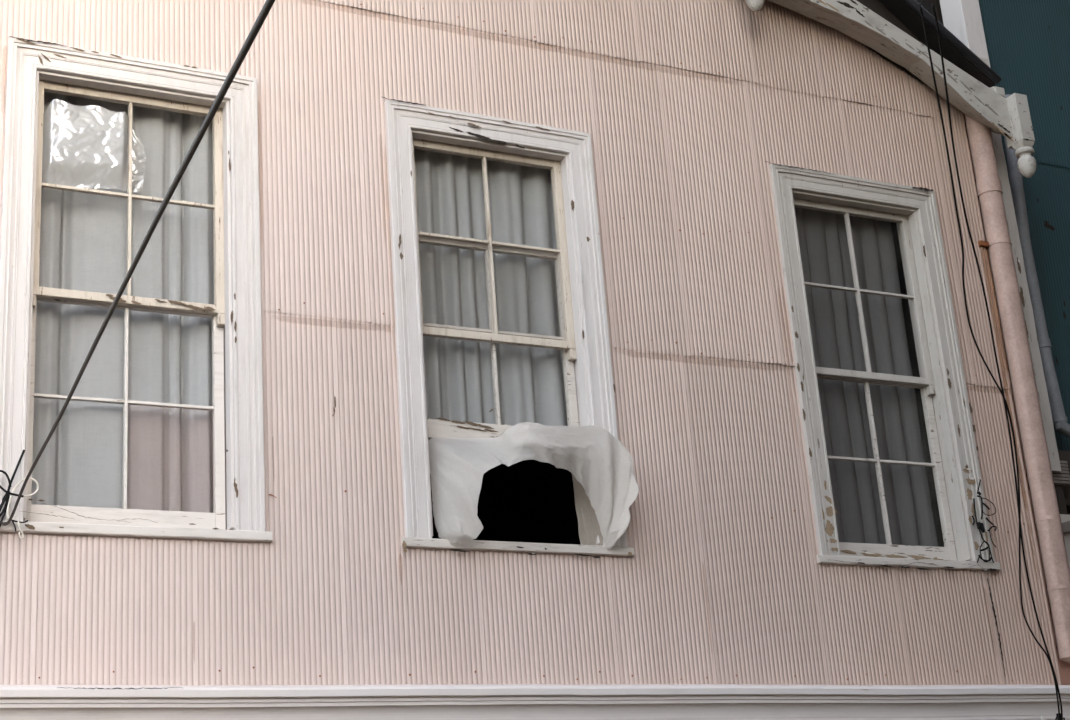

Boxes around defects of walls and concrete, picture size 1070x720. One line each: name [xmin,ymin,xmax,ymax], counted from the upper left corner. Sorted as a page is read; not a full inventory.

peeling [818,0,1014,141]
peeling [449,116,525,149]
peeling [963,464,977,524]